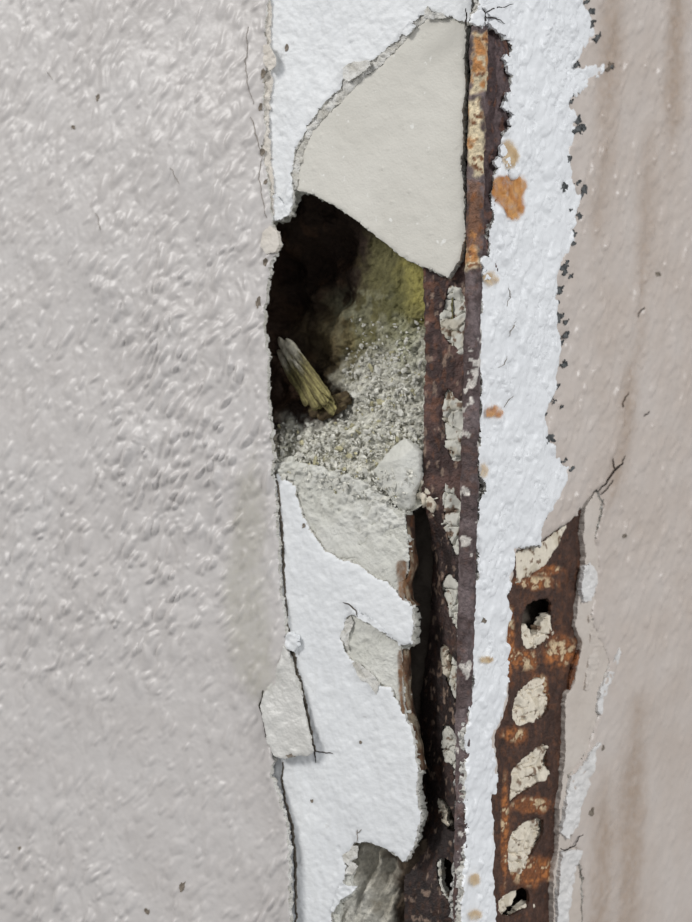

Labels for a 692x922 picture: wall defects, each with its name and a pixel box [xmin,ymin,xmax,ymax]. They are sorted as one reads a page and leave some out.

peeling [500,92,517,126]
corrosion [491,141,527,220]
flaking render [256,0,511,587]
corrosion [486,406,503,417]
peeling [260,631,314,759]
crack [275,470,333,763]
peeling [340,602,406,714]
corrosion [397,515,420,606]
corrosion [398,649,427,771]
peeling [548,492,621,922]
crack [258,690,298,922]
flaking render [331,838,428,922]